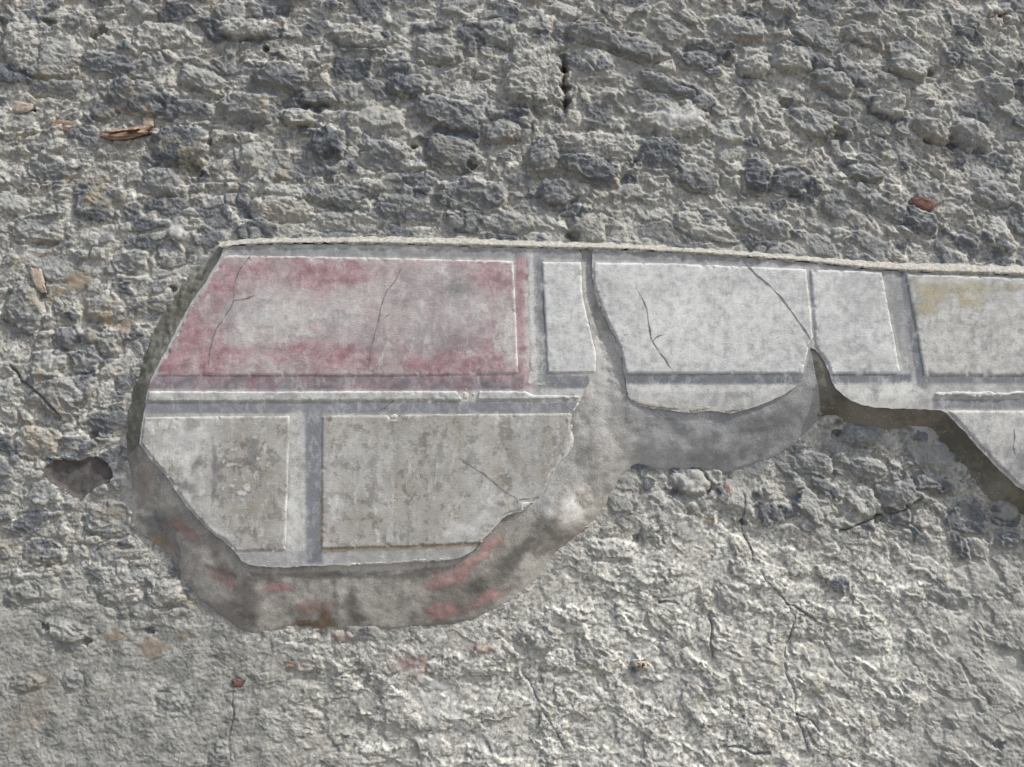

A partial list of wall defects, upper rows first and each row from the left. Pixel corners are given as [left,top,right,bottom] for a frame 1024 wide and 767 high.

crack [208,251,256,366]
crack [368,269,401,371]
crack [638,291,674,371]
crack [745,262,812,343]
peeling [222,449,250,501]
crack [840,499,921,531]
crack [740,495,819,750]